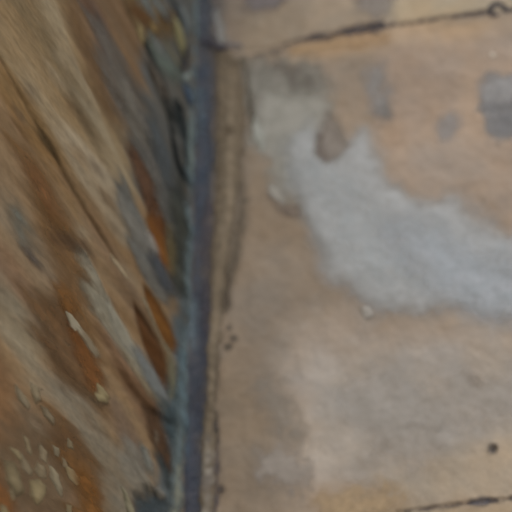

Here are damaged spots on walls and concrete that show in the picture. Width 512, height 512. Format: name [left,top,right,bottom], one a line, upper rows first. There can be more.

crack [256,2,512,57]
leakage [241,58,512,319]
rust [5,133,103,411]
peeling [65,311,99,356]
spalling [134,286,176,398]
peeling [94,383,109,402]
peeling [0,429,79,512]
rust [46,404,103,512]
rust [143,406,173,473]
crack [405,496,512,512]